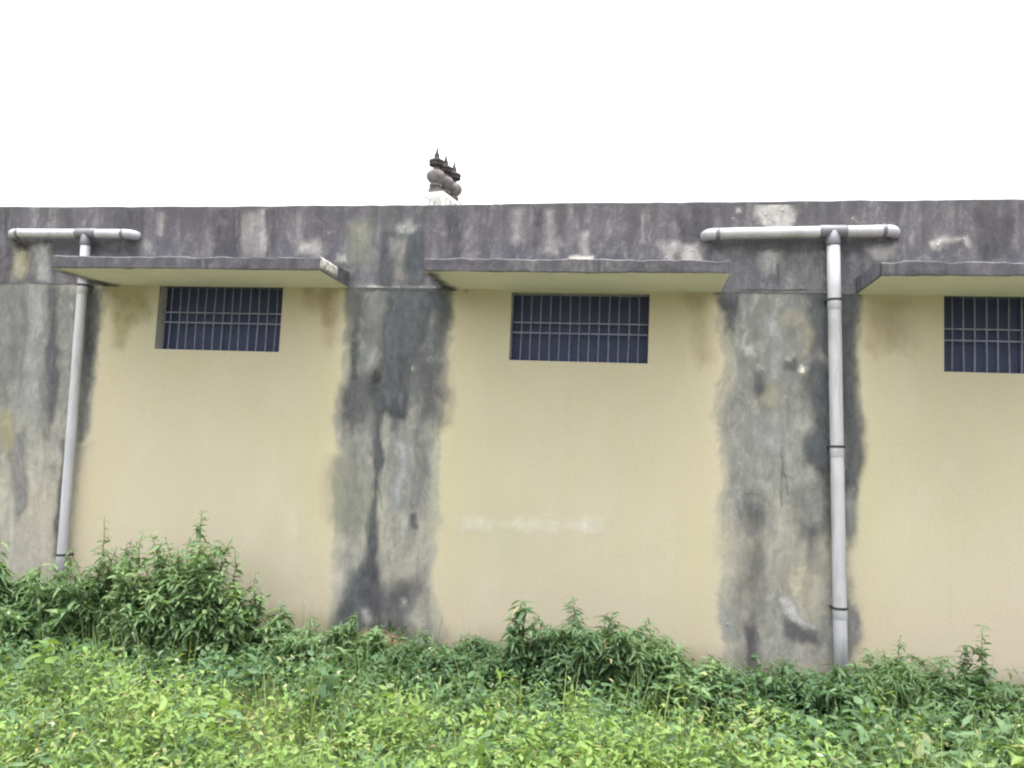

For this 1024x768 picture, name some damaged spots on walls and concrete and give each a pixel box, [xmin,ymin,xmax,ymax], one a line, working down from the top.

water stain [234,209,269,254]
water stain [570,232,593,259]
water stain [712,239,825,250]
water stain [840,237,896,252]
water stain [362,233,435,340]
water stain [0,286,58,438]
water stain [374,358,406,485]
water stain [12,432,27,513]
water stain [54,473,63,553]
water stain [796,469,830,536]
water stain [845,486,857,539]
water stain [367,500,411,637]